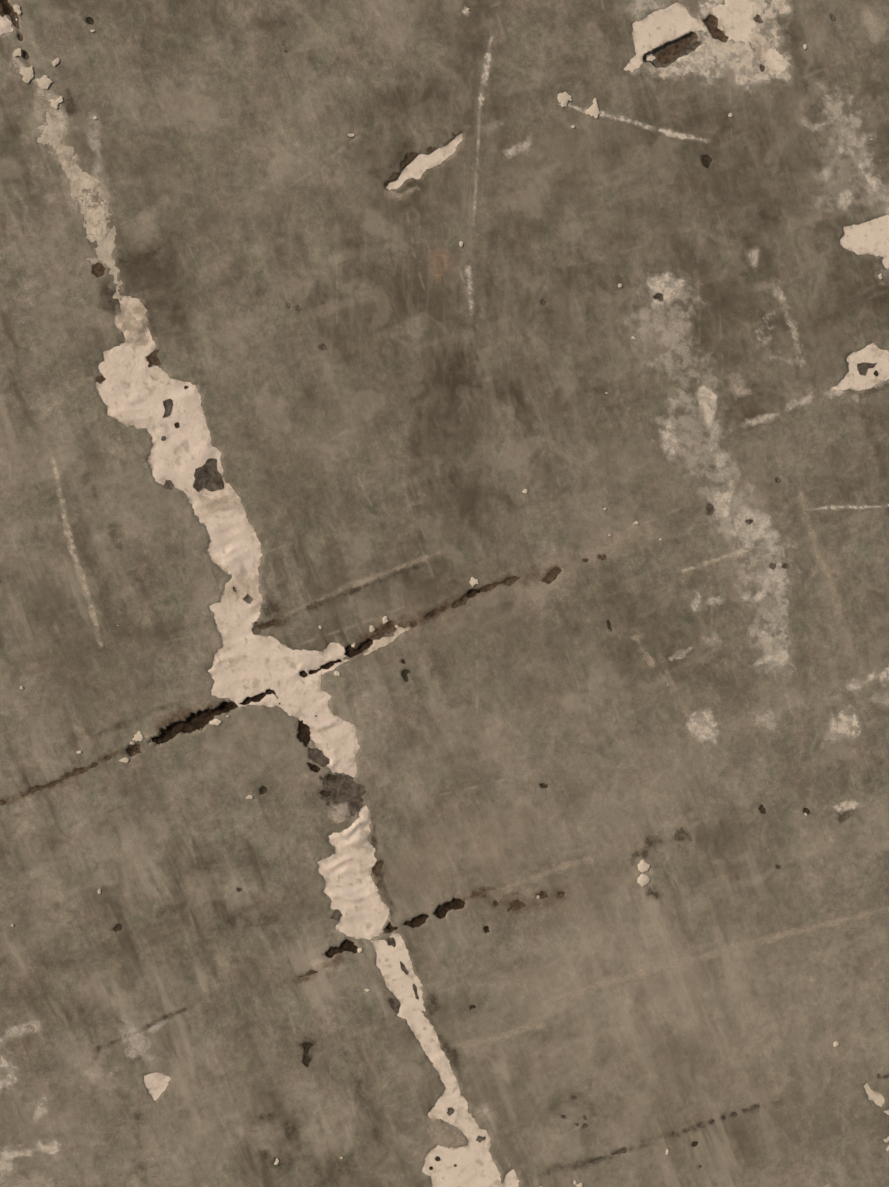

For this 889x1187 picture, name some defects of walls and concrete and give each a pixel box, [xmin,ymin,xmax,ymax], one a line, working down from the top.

spalling [624,0,790,88]
peeling [557,92,572,107]
peeling [586,98,600,119]
peeling [840,215,889,279]
peeling [831,343,889,399]
peeling [0,0,519,1187]
crack [300,555,606,678]
crack [0,689,280,805]